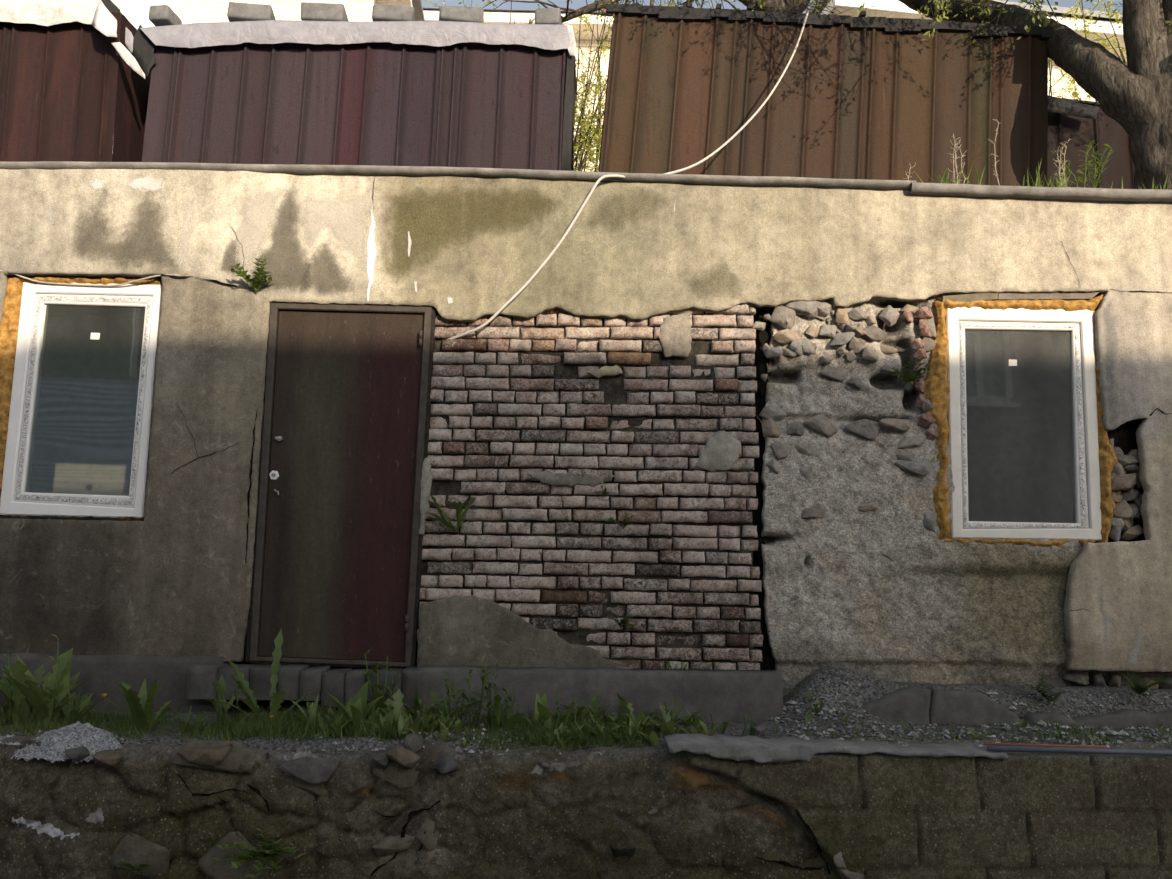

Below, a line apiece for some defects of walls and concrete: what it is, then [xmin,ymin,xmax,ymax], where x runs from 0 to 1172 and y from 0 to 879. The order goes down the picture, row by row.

leakage [77,177,192,264]
spalling [416,295,1172,696]
crack [755,809,830,875]